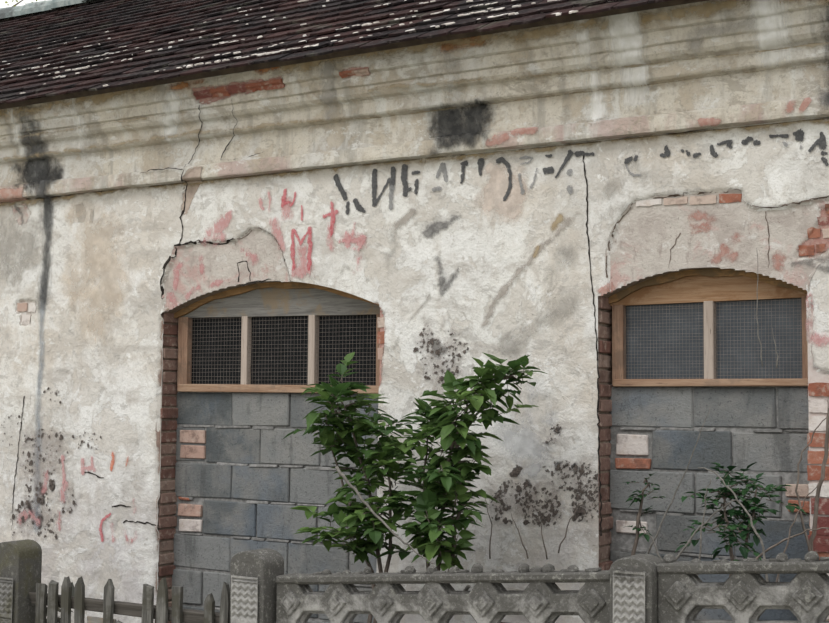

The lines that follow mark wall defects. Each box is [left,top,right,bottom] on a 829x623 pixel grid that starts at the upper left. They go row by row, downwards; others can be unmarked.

spalling [192,77,285,104]
damp [365,78,499,165]
damp [230,0,829,130]
damp [0,86,153,322]
crack [141,104,285,299]
peeling [161,228,291,311]
crack [653,189,828,267]
damp [413,326,469,385]
crack [583,155,633,536]
peeling [598,189,829,552]
crack [11,396,25,530]
damp [1,415,101,540]